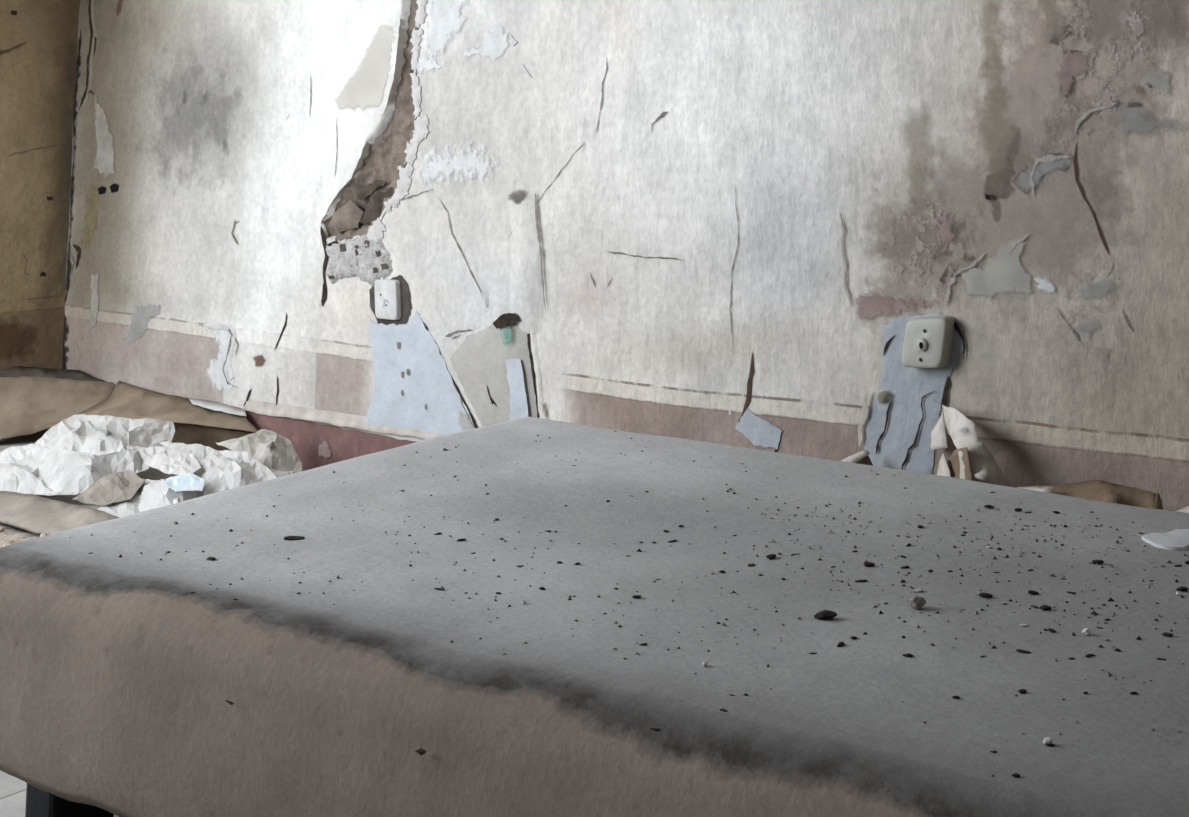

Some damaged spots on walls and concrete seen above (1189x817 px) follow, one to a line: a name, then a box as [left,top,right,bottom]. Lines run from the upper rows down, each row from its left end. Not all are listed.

water stain [1037,0,1155,156]
flaking render [316,0,538,435]
water stain [885,201,970,285]
crack [1073,142,1110,256]
flaking render [855,234,1054,474]
peeling [318,441,331,458]
flaking render [729,408,783,450]